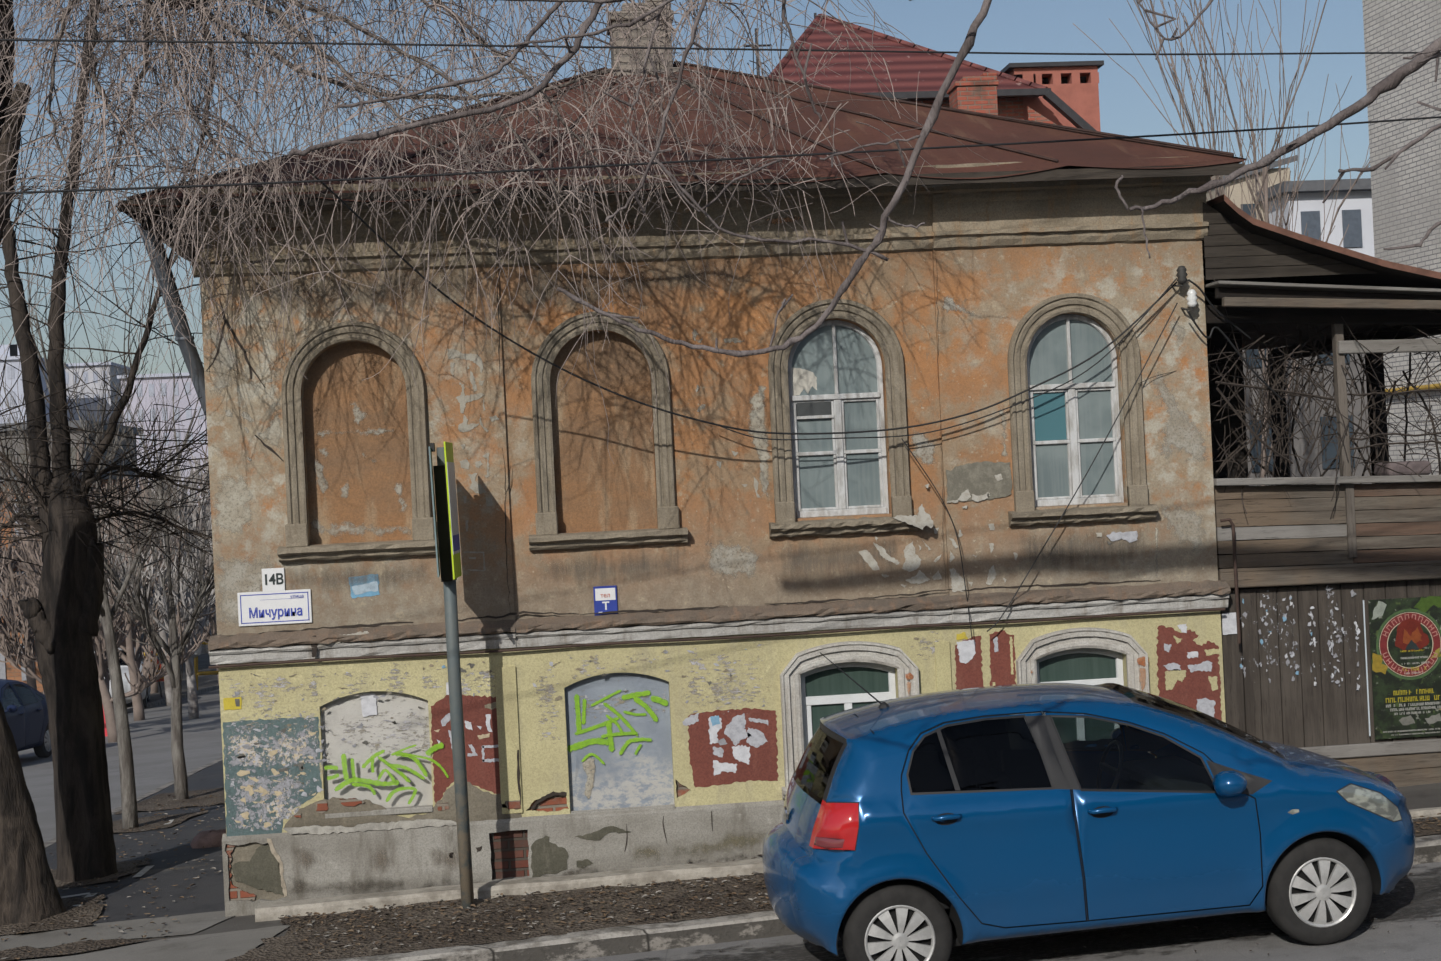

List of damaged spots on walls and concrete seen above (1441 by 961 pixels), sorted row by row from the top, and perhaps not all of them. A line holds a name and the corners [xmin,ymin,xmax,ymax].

peeling [742,386,770,498]
peeling [912,434,934,464]
flaking render [947,474,1003,509]
flaking render [1096,531,1138,545]
flaking render [859,523,1006,592]
peeling [993,637,1014,674]
peeling [1156,625,1222,721]
peeling [223,717,329,836]
flaking render [527,791,568,812]